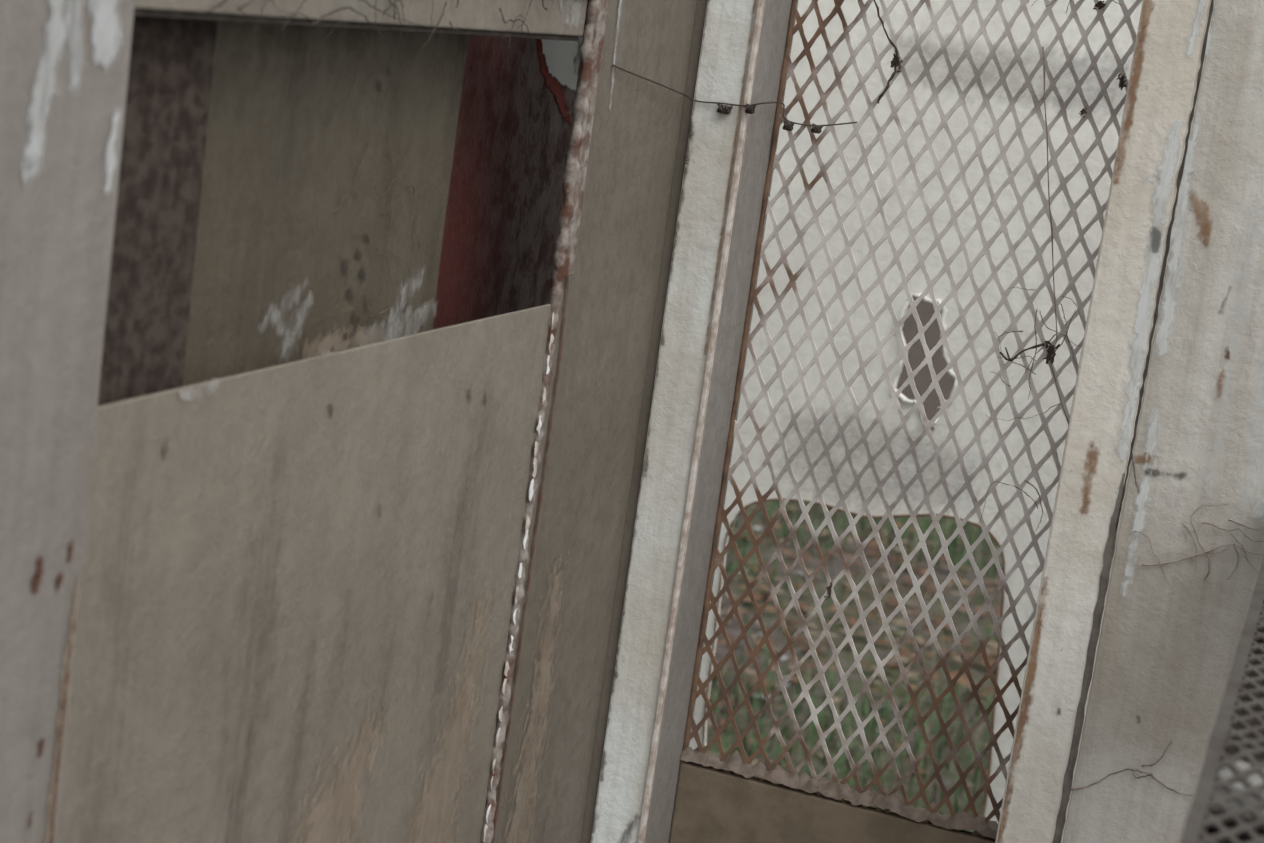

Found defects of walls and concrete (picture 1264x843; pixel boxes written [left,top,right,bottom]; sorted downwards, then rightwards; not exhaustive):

peeling [538,0,584,125]
rust [1114,0,1153,183]
peeling [1116,116,1200,461]
rust [1191,194,1211,246]
rust [32,556,43,593]
rust [57,543,73,590]
rust [1081,444,1097,513]
peeling [1122,410,1159,596]
rust [39,577,81,843]
rust [997,587,1045,843]